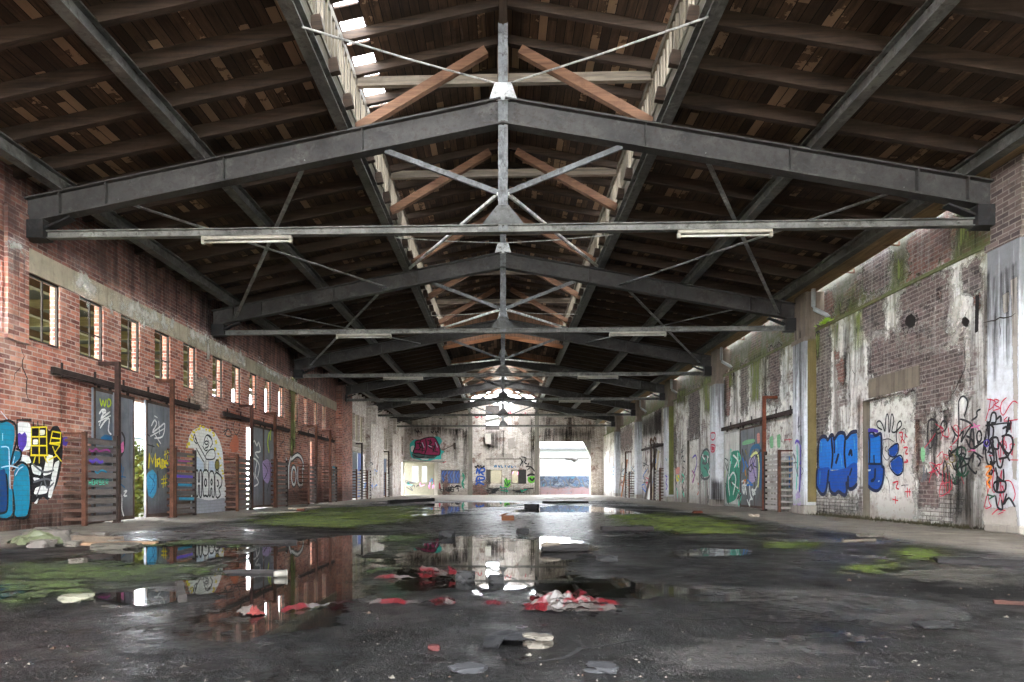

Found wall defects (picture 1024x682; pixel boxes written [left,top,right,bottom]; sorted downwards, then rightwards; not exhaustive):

damp [983,265,1014,350]
crack [13,349,29,400]
flaking render [674,382,701,468]
flaking render [725,357,750,417]
flaking render [766,339,782,412]
flaking render [815,211,984,526]